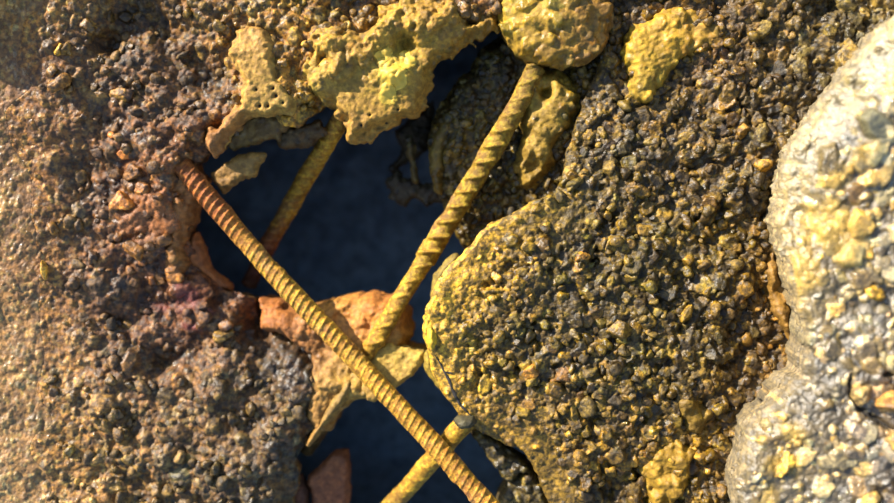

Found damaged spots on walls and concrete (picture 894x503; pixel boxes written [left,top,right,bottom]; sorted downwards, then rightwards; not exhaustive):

corrosion [122,179,202,275]
spalling [5,0,399,503]